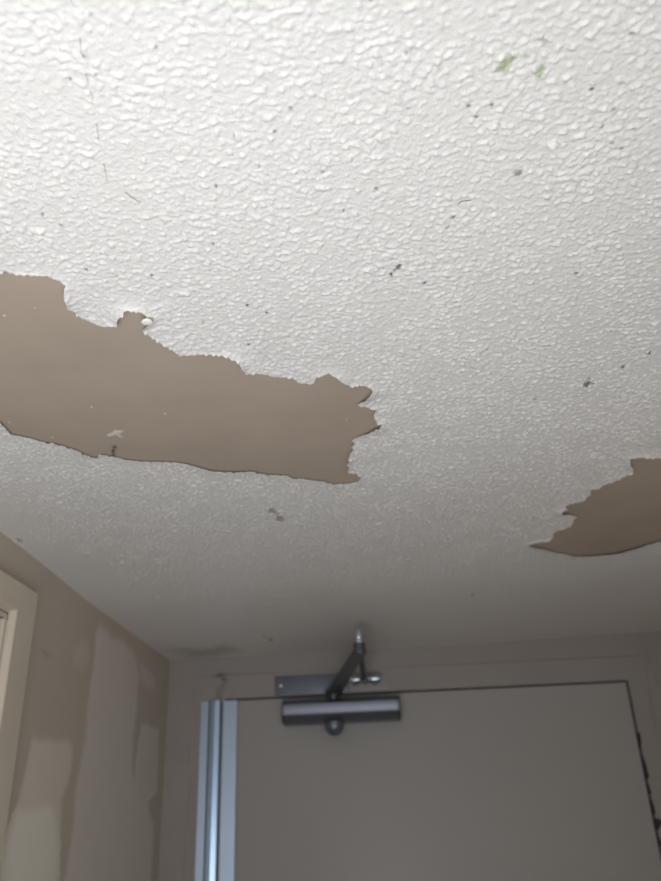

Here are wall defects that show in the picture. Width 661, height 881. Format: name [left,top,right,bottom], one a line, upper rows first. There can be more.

peeling [0,272,381,485]
peeling [529,458,661,557]